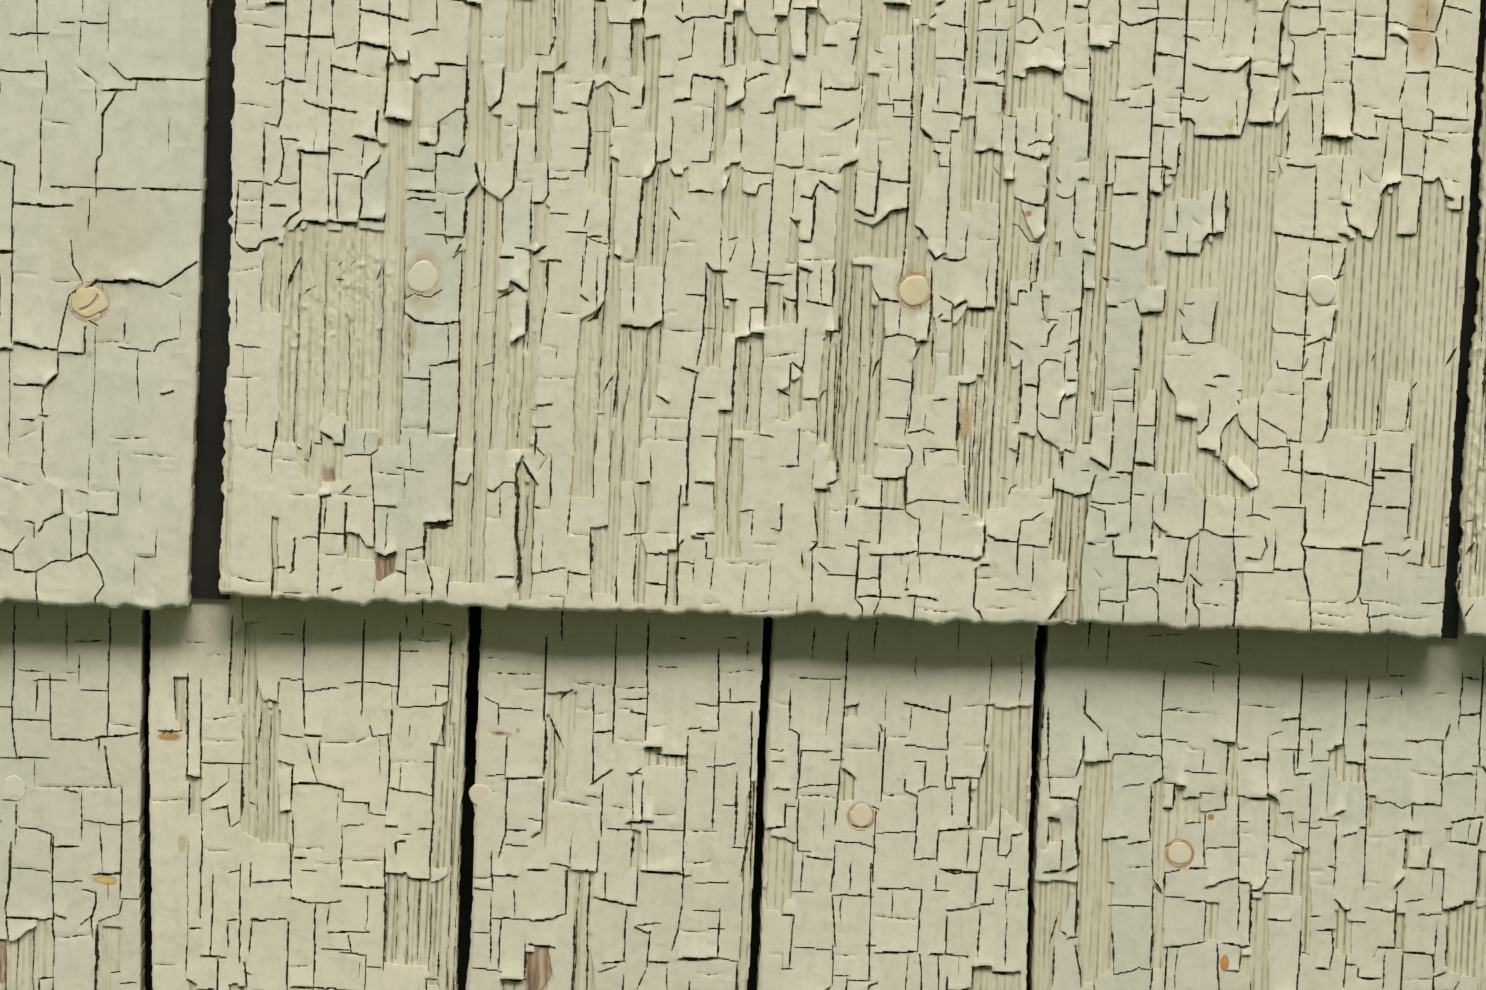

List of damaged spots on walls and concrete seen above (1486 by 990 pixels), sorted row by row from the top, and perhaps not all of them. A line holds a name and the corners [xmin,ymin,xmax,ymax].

crack [0,0,203,990]
peeling [219,425,234,589]
peeling [260,0,572,601]
peeling [569,2,689,606]
peeling [705,0,1120,626]
peeling [1134,0,1319,498]
peeling [1328,58,1486,598]
peeling [384,633,468,990]
peeling [737,778,797,990]
peeling [971,704,1033,831]
rust [1166,839,1194,868]
peeling [1224,744,1312,990]